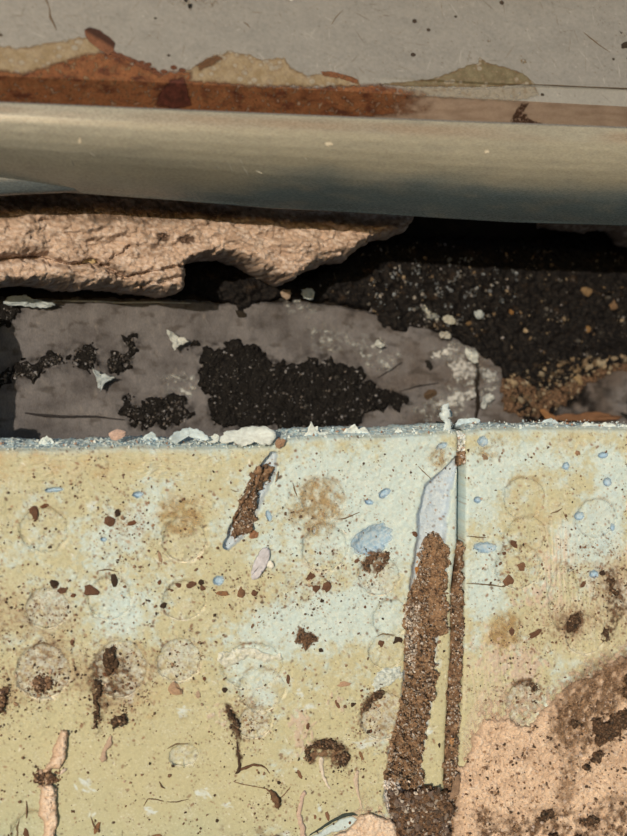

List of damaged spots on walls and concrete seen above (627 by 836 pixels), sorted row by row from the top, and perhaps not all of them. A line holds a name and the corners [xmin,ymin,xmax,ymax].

corrosion [0,27,414,117]
spalling [157,233,194,244]
peeling [301,288,315,300]
peeling [0,295,55,328]
peeling [439,315,456,339]
peeling [0,333,139,391]
peeling [465,346,478,363]
peeling [118,330,409,447]
peeling [439,403,481,431]
crack [455,363,480,466]
peeling [481,393,495,409]
crack [376,531,502,836]